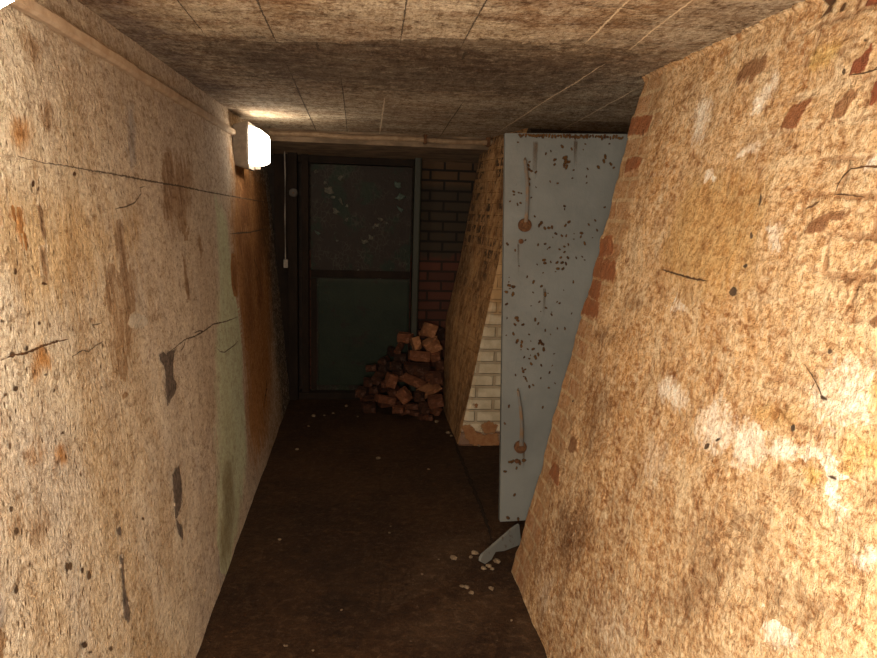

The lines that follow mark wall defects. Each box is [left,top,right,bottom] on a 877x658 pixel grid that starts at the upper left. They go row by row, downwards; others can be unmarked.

spalling [821,0,846,18]
flaking render [830,39,877,124]
flaking render [779,94,814,133]
rust [0,188,49,284]
flaking render [802,205,858,237]
flaking render [581,233,619,321]
crack [1,339,102,361]
spalling [159,348,177,405]
crack [171,317,236,351]
damp [531,63,877,658]
peeling [462,421,500,446]
spalling [173,464,183,539]